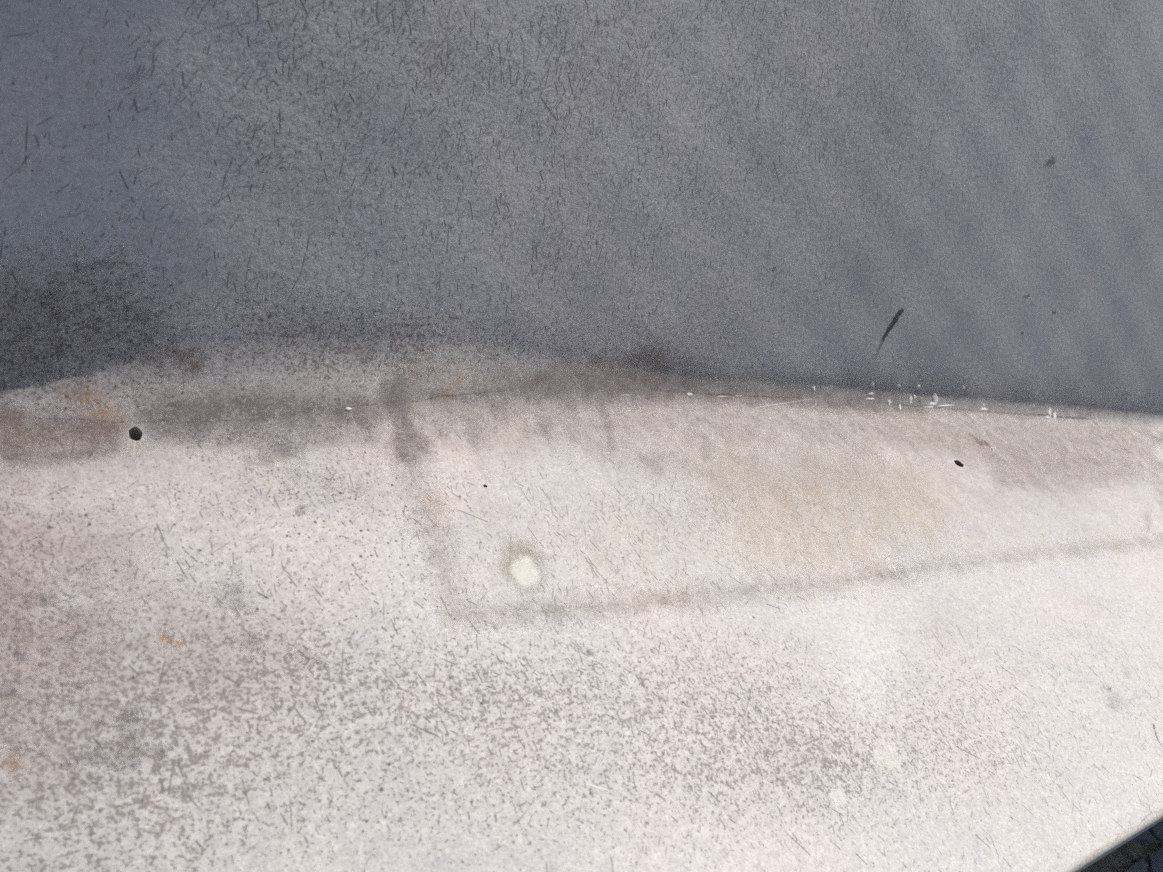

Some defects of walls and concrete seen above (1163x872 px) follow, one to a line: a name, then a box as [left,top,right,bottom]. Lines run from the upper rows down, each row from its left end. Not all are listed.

water stain [881,309,904,345]
water stain [0,417,119,466]
water stain [138,367,1156,486]
water stain [507,552,538,585]